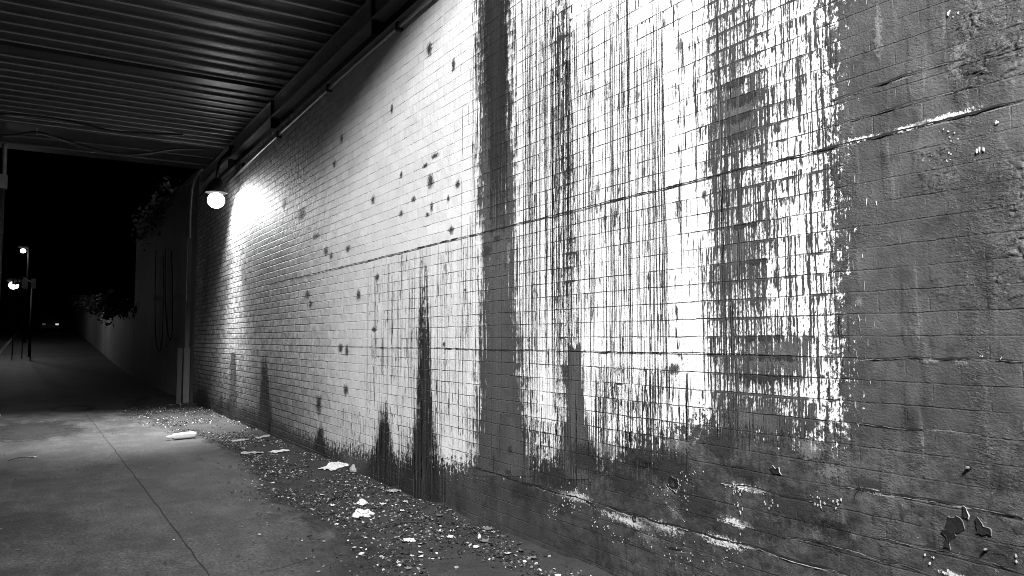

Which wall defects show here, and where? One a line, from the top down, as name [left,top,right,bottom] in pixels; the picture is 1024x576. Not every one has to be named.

water stain [341,0,886,552]
crack [271,57,1024,285]
spalling [924,505,992,565]